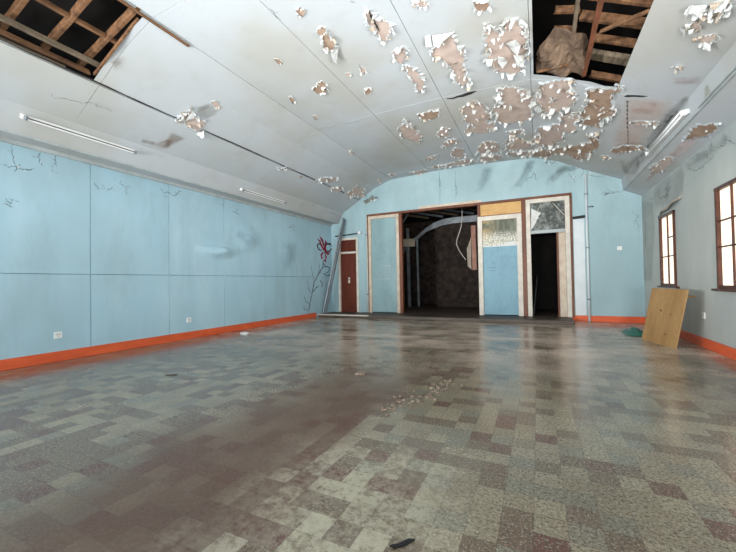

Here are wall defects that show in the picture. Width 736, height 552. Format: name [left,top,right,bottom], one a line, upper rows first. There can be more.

peeling [679,0,735,51]
peeling [315,25,340,64]
peeling [362,6,427,94]
peeling [409,0,648,176]
peeling [175,106,207,139]
peeling [396,108,441,143]
peeling [681,122,725,142]
crack [6,145,59,174]
peeling [315,176,379,206]